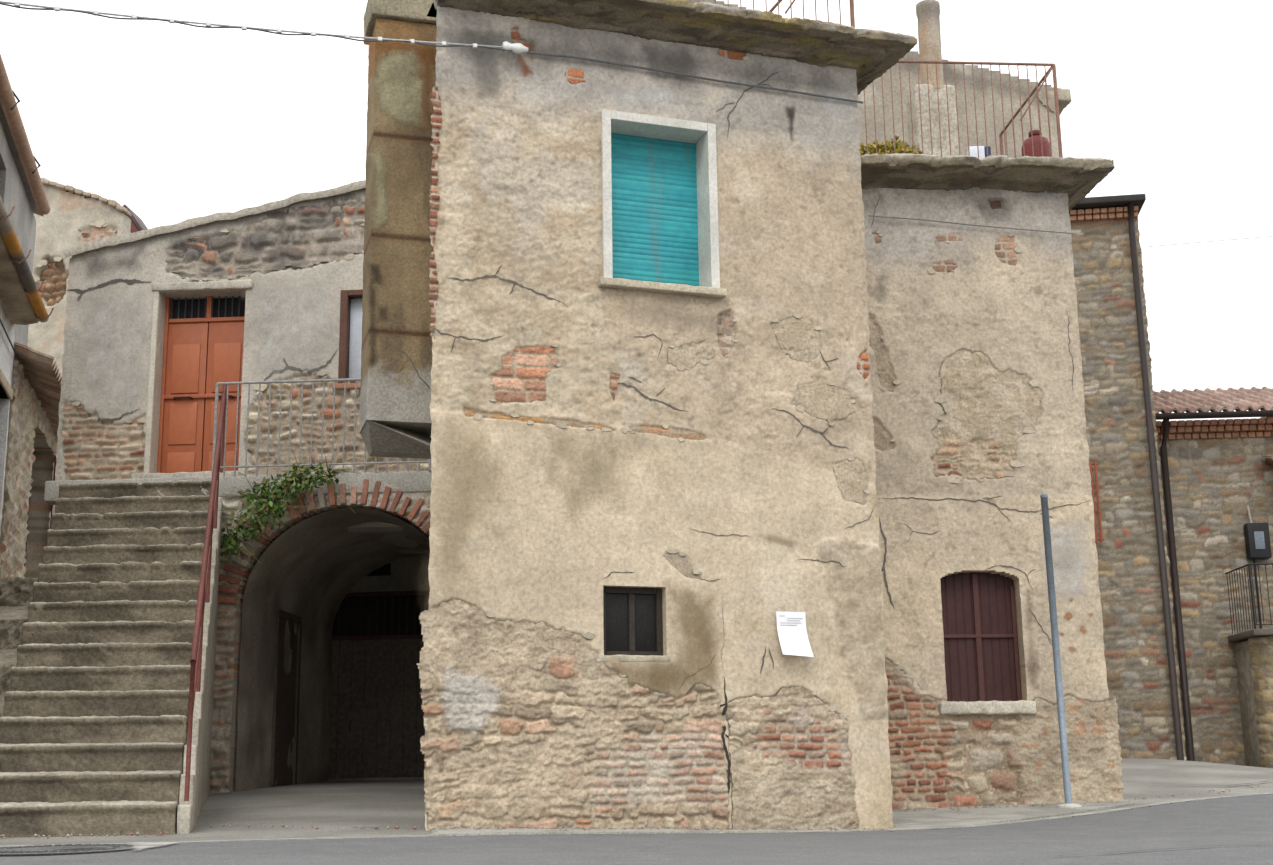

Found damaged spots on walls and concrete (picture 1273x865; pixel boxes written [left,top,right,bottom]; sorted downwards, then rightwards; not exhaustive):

crack [717,71,781,132]
spalling [41,177,131,217]
flaking render [165,153,387,282]
flaking render [376,54,442,339]
flaking render [463,343,706,442]
crack [633,334,663,356]
crack [618,377,685,411]
crack [770,408,851,451]
flaking render [417,598,859,829]
crack [678,574,731,793]
crack [760,647,774,674]
flaking render [885,658,1125,809]